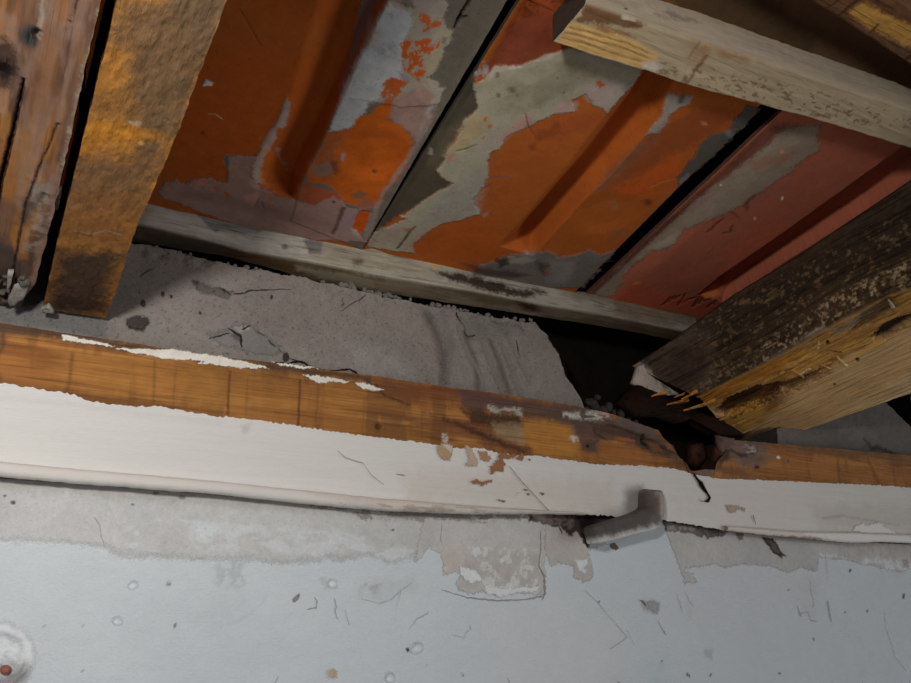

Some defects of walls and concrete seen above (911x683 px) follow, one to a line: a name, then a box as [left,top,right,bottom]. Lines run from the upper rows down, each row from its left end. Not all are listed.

crack [209,325,358,374]
peeling [438,443,453,460]
peeling [464,445,530,486]
peeling [0,478,619,597]